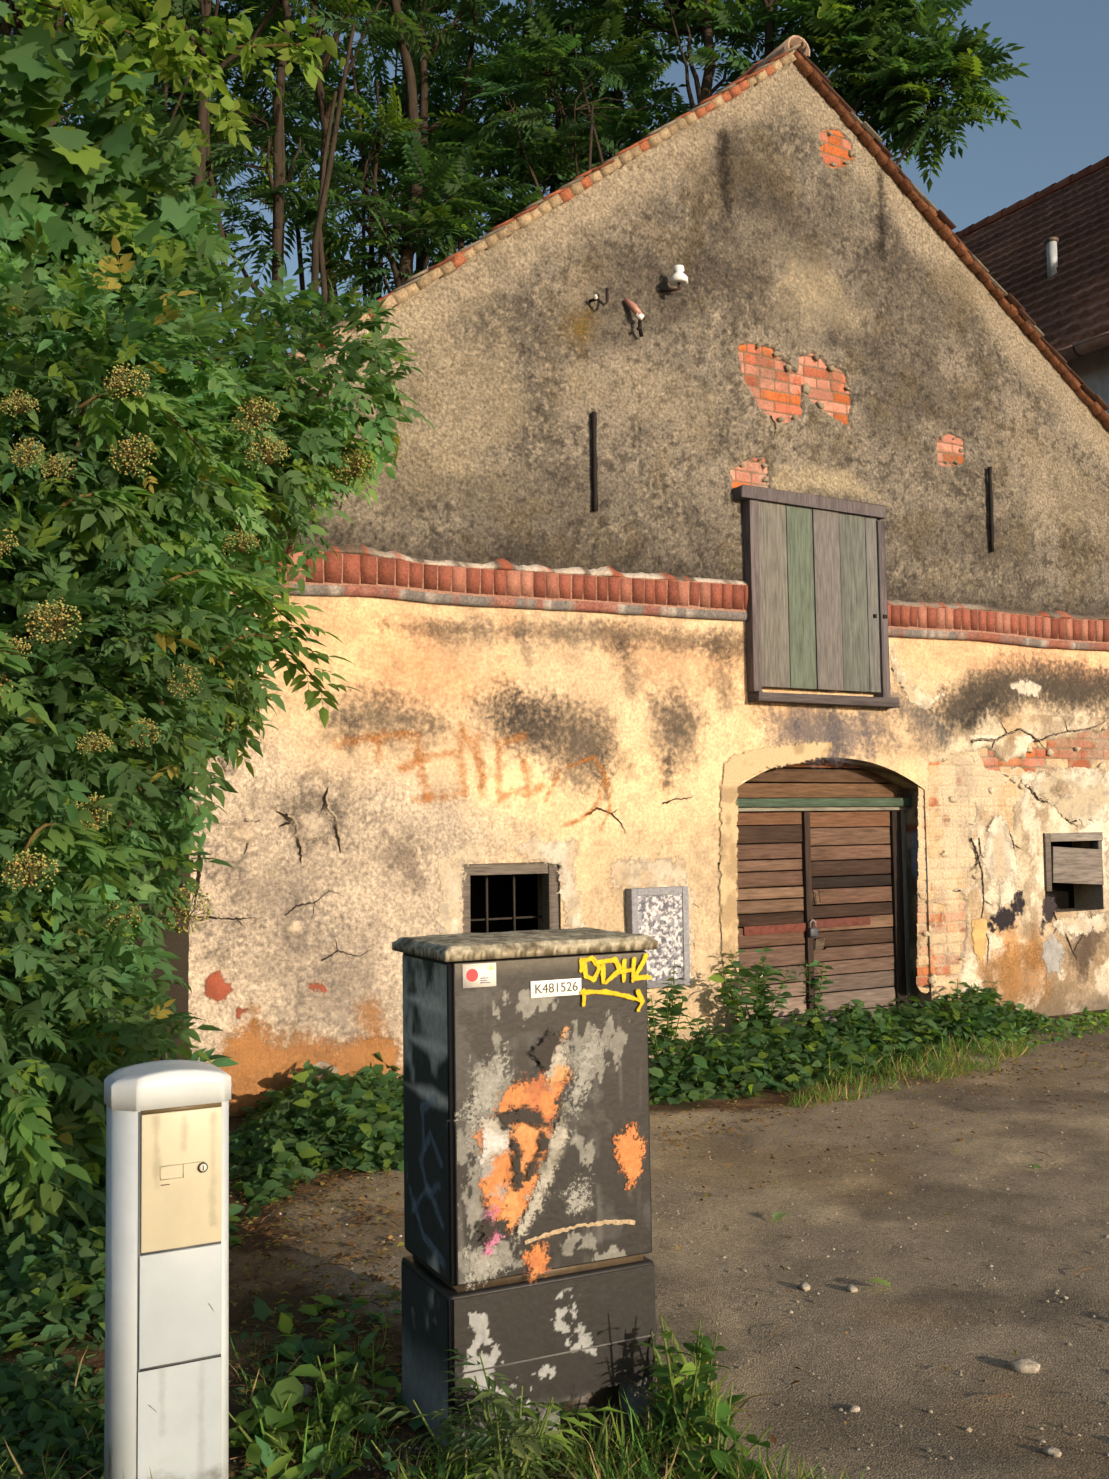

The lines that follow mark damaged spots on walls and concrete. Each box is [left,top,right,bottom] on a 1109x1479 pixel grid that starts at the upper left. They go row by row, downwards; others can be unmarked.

flaking render [738,342,850,428]
leakage [475,691,617,786]
leakage [653,697,699,758]
leakage [764,704,892,759]
leakage [893,661,1109,745]
peeling [1010,679,1041,699]
crack [971,718,1109,749]
crack [194,855,372,961]
crack [243,786,344,863]
crack [971,821,1022,971]
flaking render [916,726,1109,993]
flaking render [205,970,248,1019]